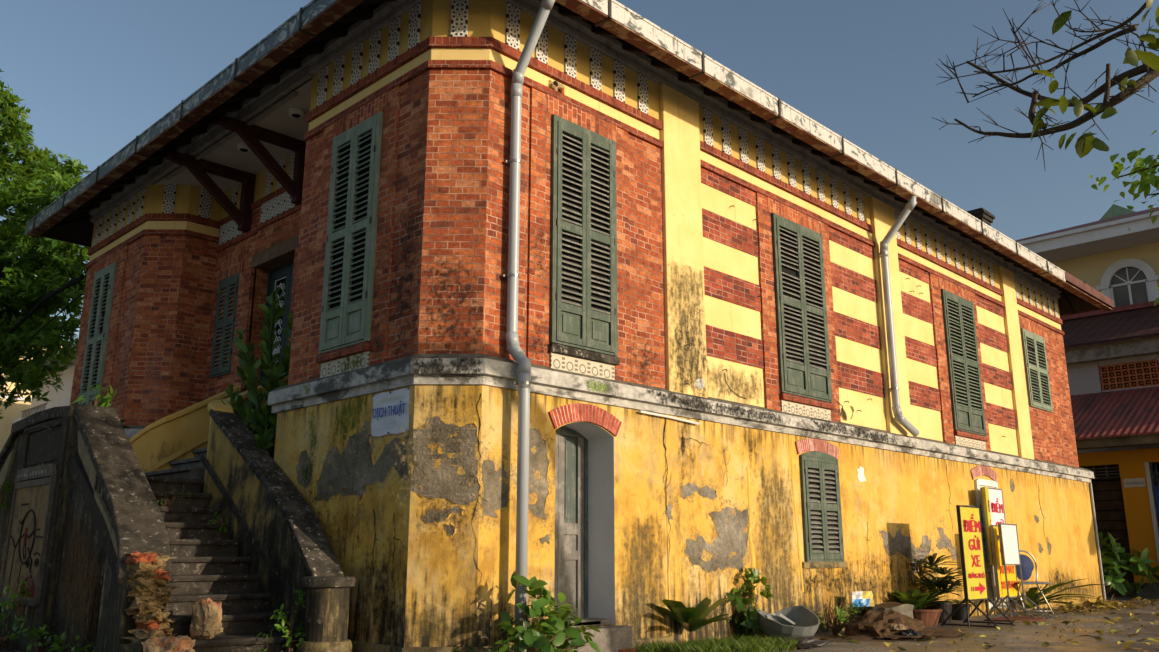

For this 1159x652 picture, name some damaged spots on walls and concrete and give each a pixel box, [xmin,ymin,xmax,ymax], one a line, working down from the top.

spalling [547,80,565,94]
leakage [631,266,783,425]
leakage [366,550,401,633]
flaking render [292,411,557,545]
leakage [622,519,663,637]
flaking render [660,482,749,579]
leakage [758,466,937,610]
flaking render [876,520,959,577]